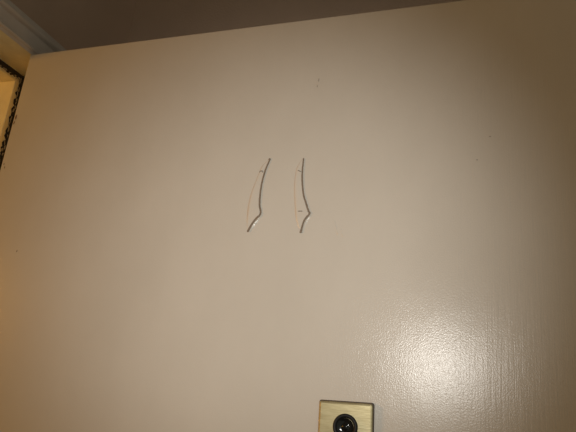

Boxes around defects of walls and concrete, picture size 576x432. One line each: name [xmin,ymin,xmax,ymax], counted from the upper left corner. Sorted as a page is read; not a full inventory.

crack [247,158,271,232]
crack [294,158,311,233]